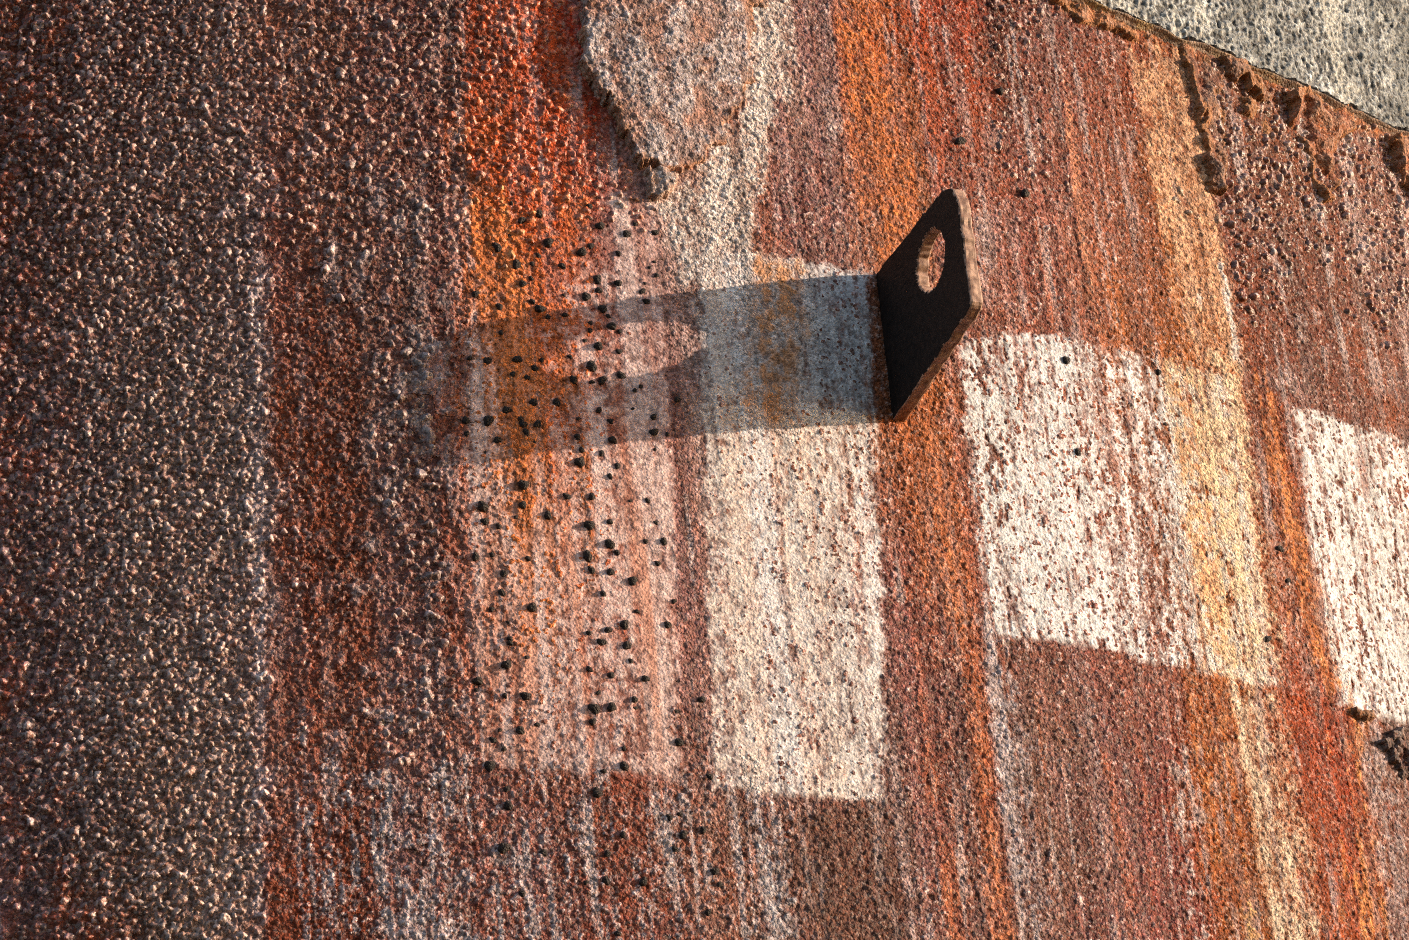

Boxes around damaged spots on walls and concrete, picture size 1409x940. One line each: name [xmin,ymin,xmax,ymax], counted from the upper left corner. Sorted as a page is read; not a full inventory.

peeling [1049,0,1154,44]
corrosion [979,0,1409,395]
peeling [1179,43,1357,204]
peeling [1384,132,1409,200]
corrosion [0,0,670,940]
corrosion [1248,347,1405,940]